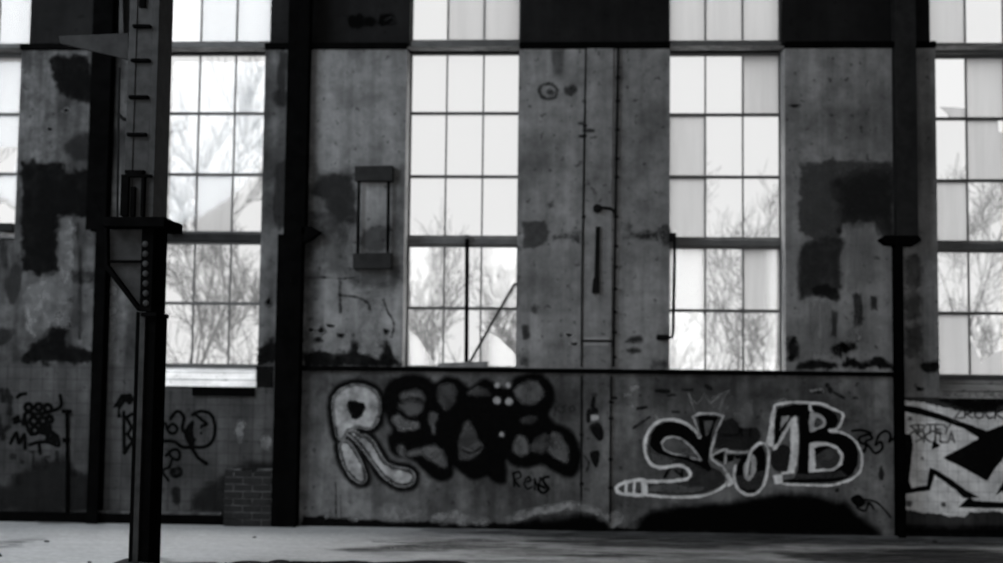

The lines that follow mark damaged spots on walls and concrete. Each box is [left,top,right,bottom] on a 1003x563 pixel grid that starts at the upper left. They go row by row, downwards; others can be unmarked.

water stain [49,53,91,104]
water stain [0,133,94,366]
water stain [787,160,893,371]
water stain [0,459,87,524]